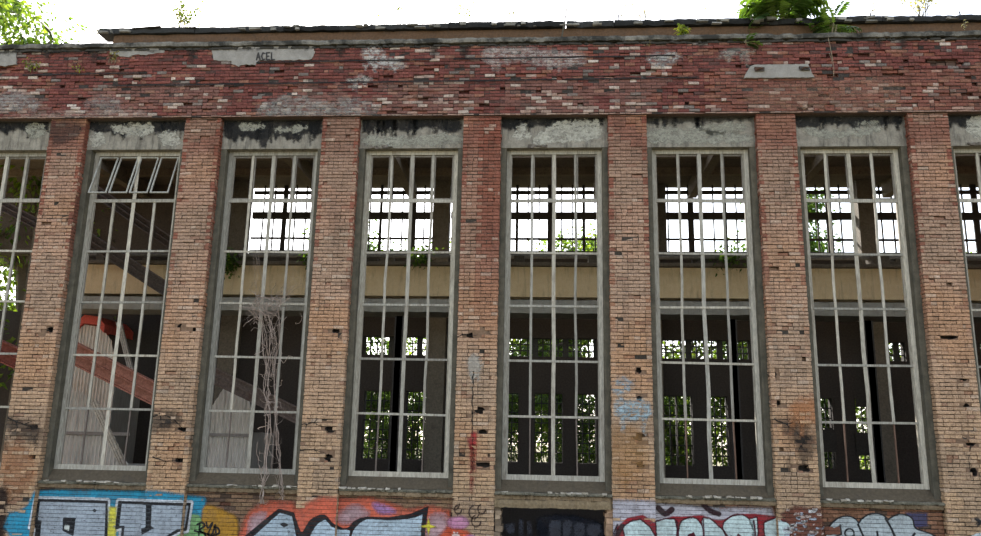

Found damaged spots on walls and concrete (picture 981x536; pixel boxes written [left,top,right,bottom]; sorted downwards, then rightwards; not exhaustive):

peeling [89,121,181,147]
peeling [966,115,981,146]
peeling [781,498,894,536]